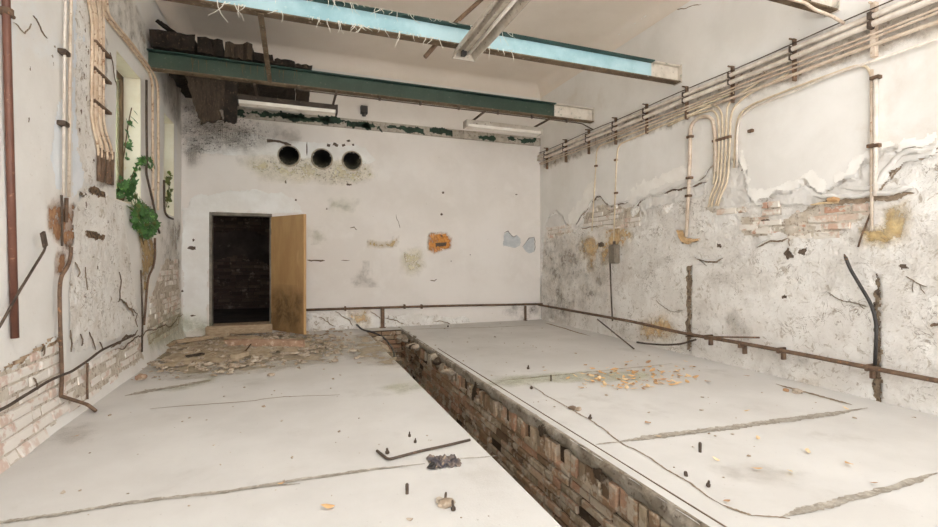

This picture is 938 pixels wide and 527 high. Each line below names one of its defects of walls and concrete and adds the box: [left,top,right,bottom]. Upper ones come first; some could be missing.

peeling [237,109,453,137]
spalling [0,0,181,474]
crack [70,272,183,352]
spalling [503,132,938,416]
leakage [864,208,905,242]
crack [125,380,324,409]
crack [499,363,938,519]
crack [0,463,425,524]